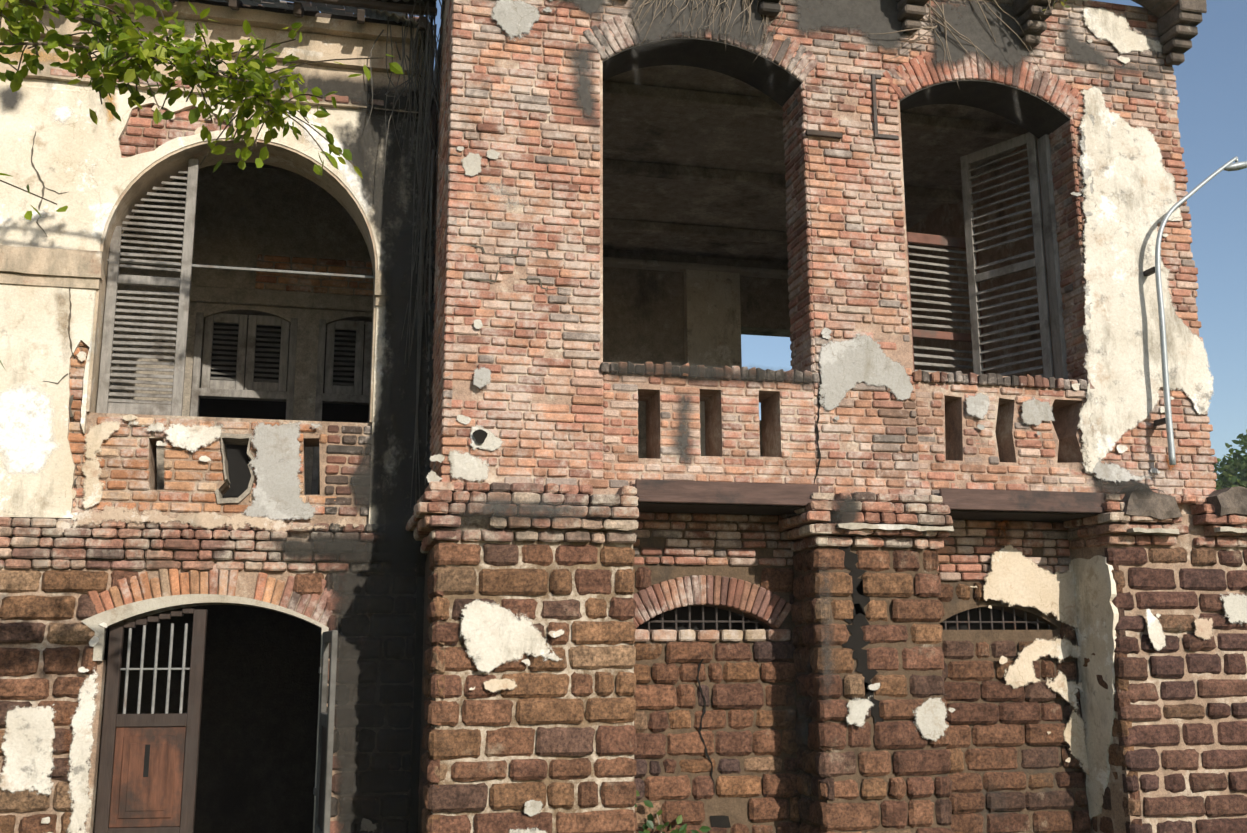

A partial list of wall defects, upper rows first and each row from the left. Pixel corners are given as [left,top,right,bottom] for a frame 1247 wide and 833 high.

flaking render [1082,0,1163,64]
crack [31,131,67,236]
spalling [119,104,232,158]
flaking render [1071,87,1214,483]
peeling [0,340,360,536]
water stain [263,72,436,833]
flaking render [819,328,915,420]
flaking render [0,667,98,833]
flaking render [461,599,564,692]
crack [697,659,715,793]
crack [838,535,884,724]
flaking render [970,545,1119,819]